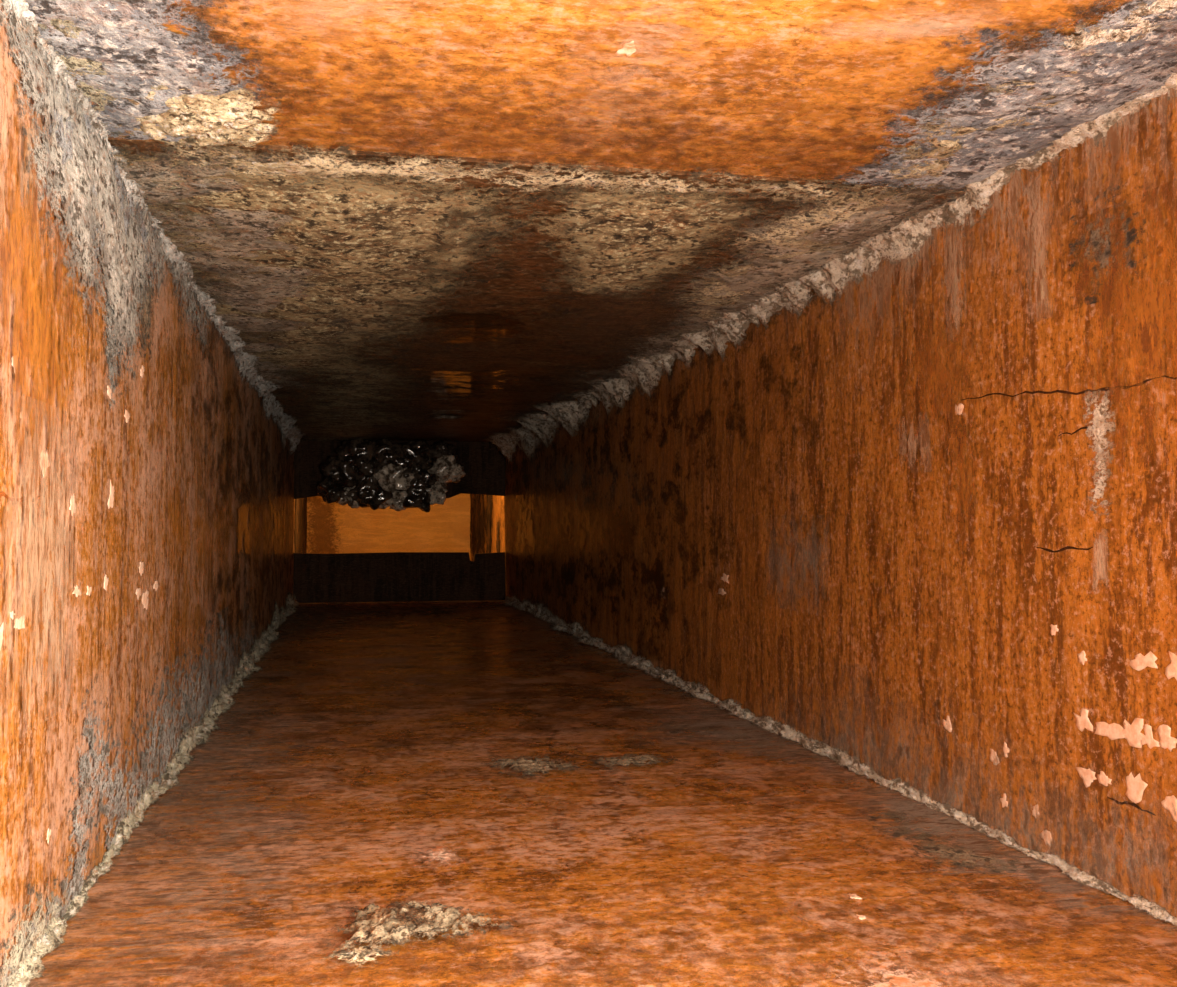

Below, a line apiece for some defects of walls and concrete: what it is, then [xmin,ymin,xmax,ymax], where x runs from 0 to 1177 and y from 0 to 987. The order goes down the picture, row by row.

corrosion [1068,178,1177,468]
corrosion [0,113,77,692]
crack [962,375,1177,400]
crack [1059,426,1110,436]
damp [1083,391,1116,515]
crack [1037,545,1093,553]
damp [1092,532,1108,589]
peeling [1130,651,1177,680]
peeling [1073,708,1177,752]
peeling [1075,767,1148,803]
spalling [322,900,512,969]
corrosion [143,910,1043,987]